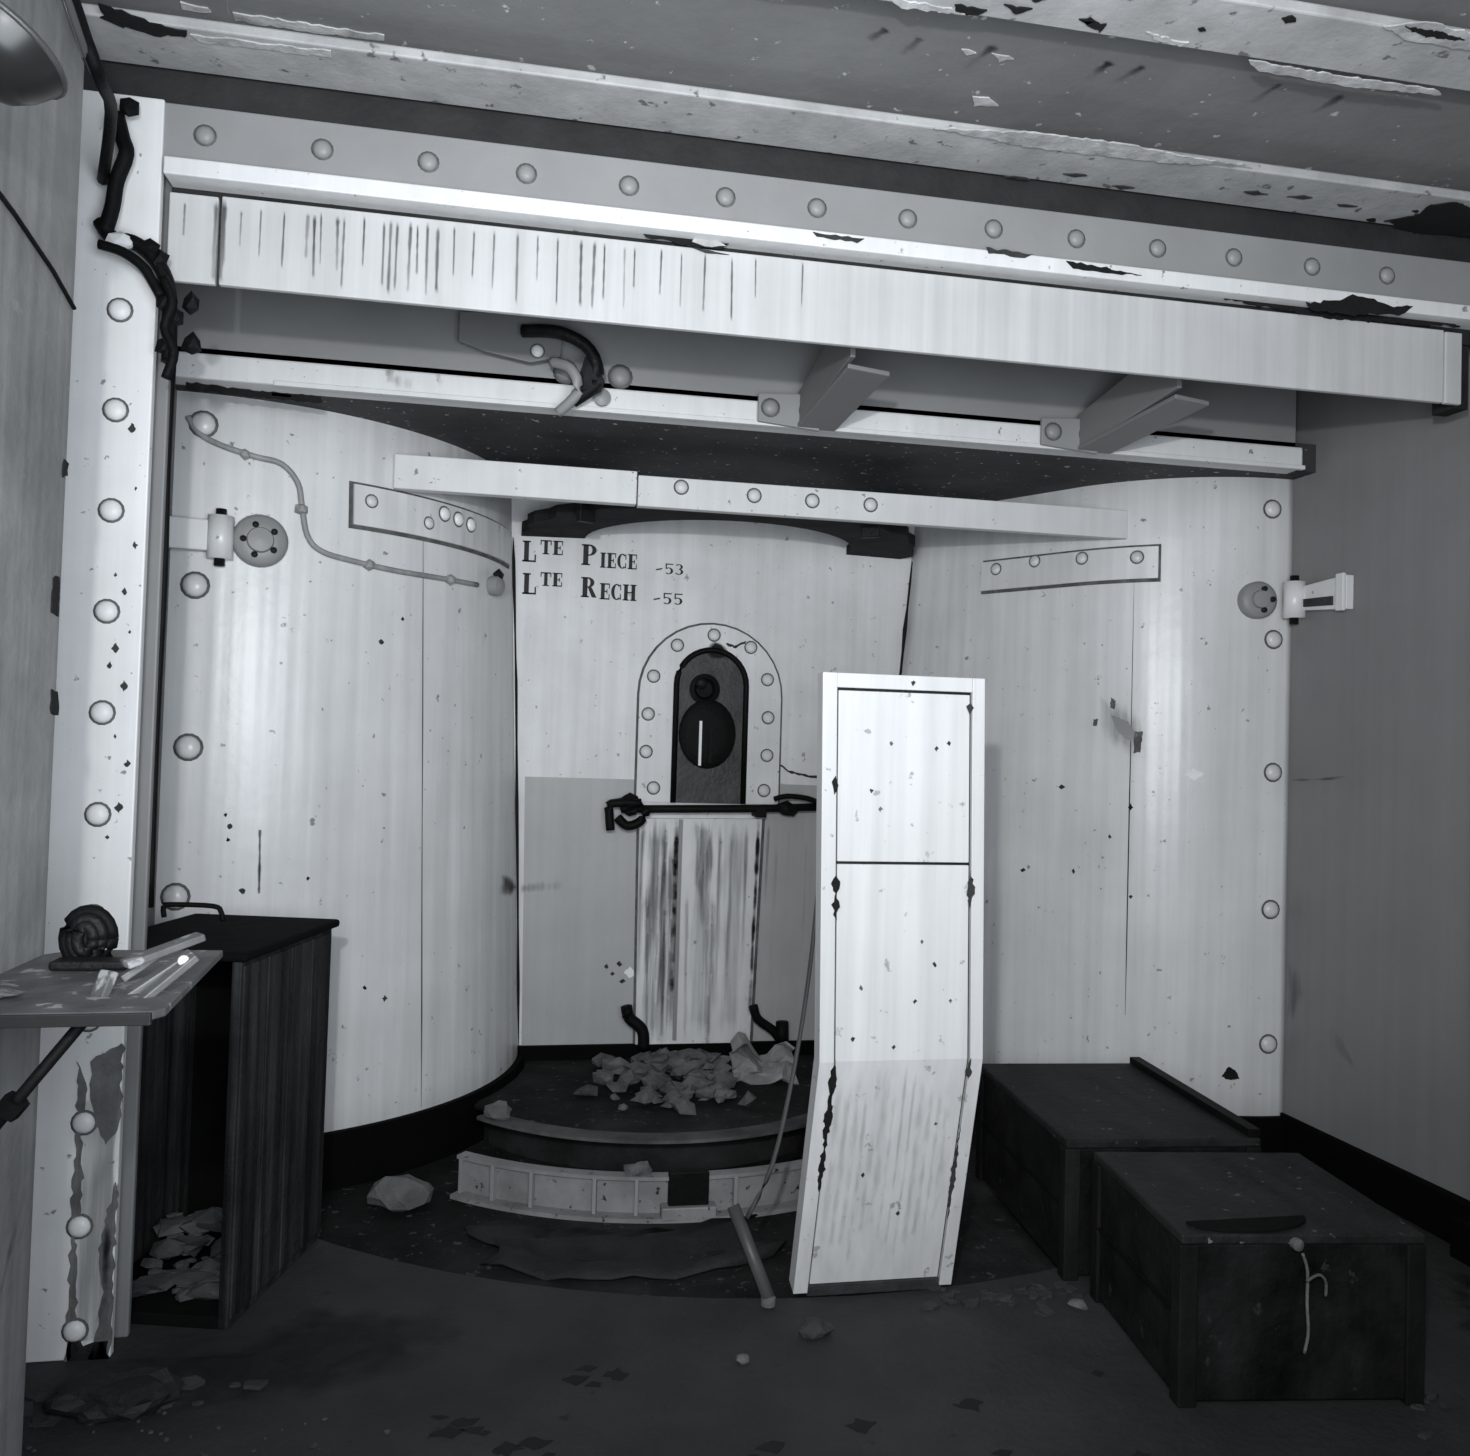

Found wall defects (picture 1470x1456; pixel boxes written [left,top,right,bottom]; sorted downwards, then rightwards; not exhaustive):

peeling [892,0,1042,16]
peeling [1079,17,1107,33]
peeling [1147,27,1206,47]
peeling [1383,21,1470,50]
peeling [961,48,1014,63]
peeling [1249,59,1441,96]
peeling [933,127,1252,167]
spalling [1337,202,1470,238]
corrosion [646,834,679,991]
corrosion [749,836,760,1000]